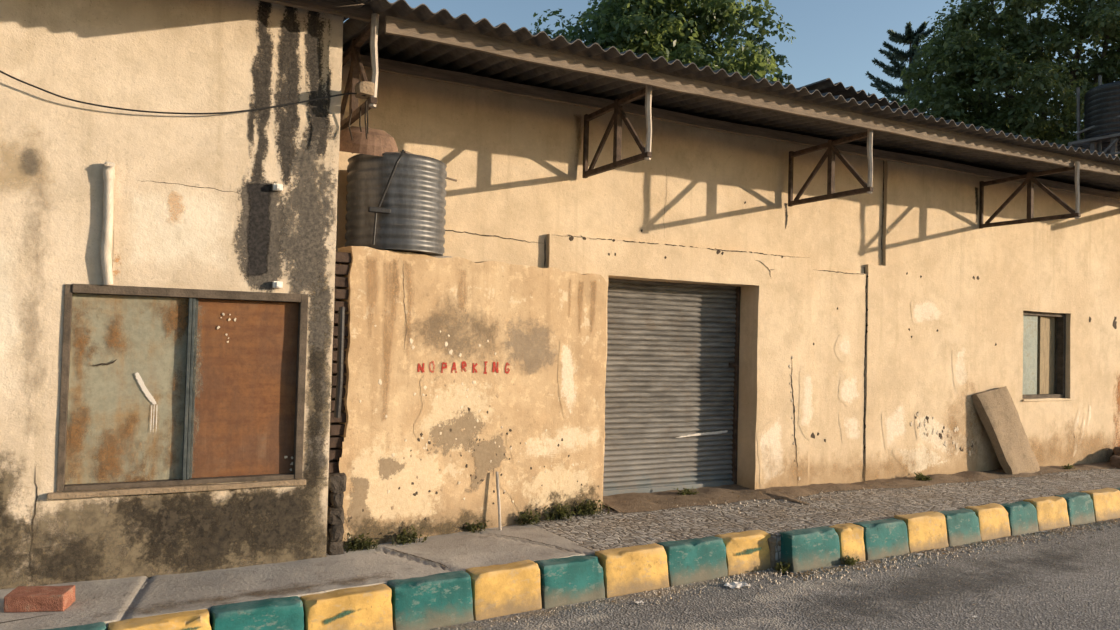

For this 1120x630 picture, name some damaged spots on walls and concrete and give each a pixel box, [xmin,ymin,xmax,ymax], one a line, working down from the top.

damp [0,274,333,590]
corrosion [163,299,189,339]
crack [142,181,239,194]
damp [234,1,332,293]
crack [445,160,884,480]
flaking render [893,408,977,477]